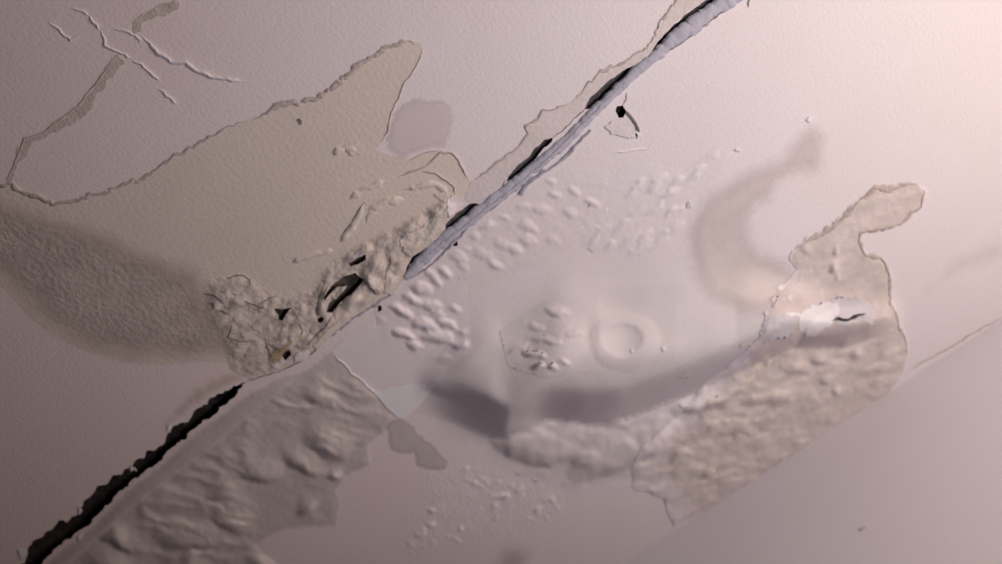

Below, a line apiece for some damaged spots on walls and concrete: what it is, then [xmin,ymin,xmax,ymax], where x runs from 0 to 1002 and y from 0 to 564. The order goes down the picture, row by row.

water stain [0,215,221,350]
crack [6,0,248,182]
peeling [0,0,705,380]
crack [406,251,422,271]
crack [446,66,633,229]
crack [652,0,713,51]
water stain [694,136,818,308]
peeling [632,182,928,527]
crack [18,357,309,564]